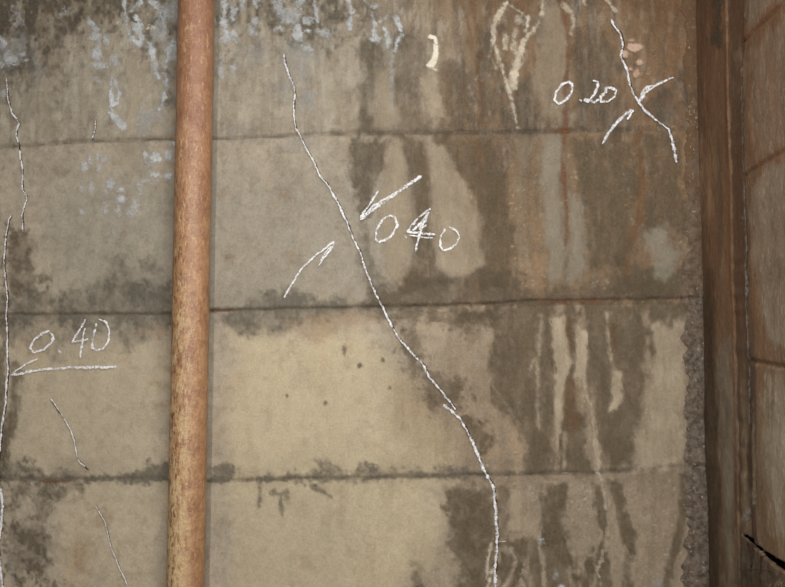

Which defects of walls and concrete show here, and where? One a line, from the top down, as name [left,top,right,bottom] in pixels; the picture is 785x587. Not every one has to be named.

leakage [0,0,117,74]
leakage [82,0,177,137]
crack [612,19,678,162]
leakage [137,141,175,194]
crack [0,78,28,459]
leakage [0,228,93,330]
crack [285,58,499,587]
leakage [350,1,686,474]
leakage [1,520,50,587]
leakage [0,359,64,498]
leakage [80,460,168,490]
leakage [442,480,635,587]